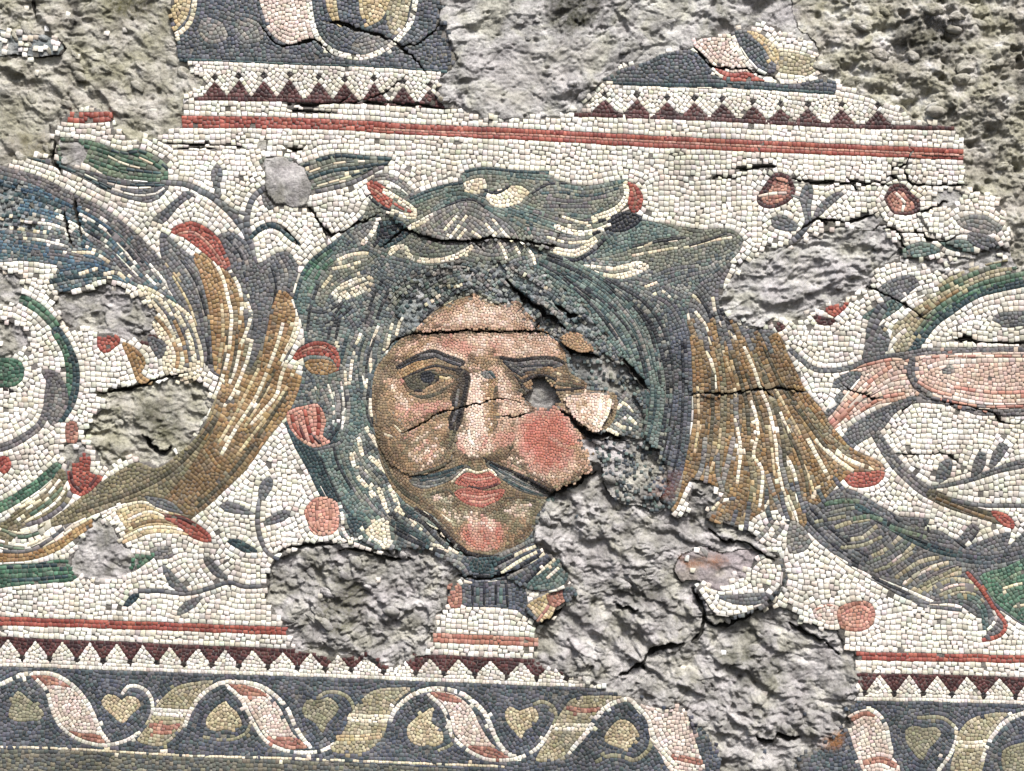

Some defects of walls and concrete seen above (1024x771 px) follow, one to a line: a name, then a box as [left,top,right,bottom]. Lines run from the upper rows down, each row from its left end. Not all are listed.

spalling [0,0,204,167]
crack [264,21,440,70]
spalling [436,0,1024,328]
crack [713,158,967,248]
crack [866,286,923,318]
spalling [60,377,213,471]
crack [405,398,525,432]
crack [560,410,621,440]
crack [691,387,802,396]
spalling [70,517,138,583]
spalling [266,542,463,666]
spalling [533,434,860,771]